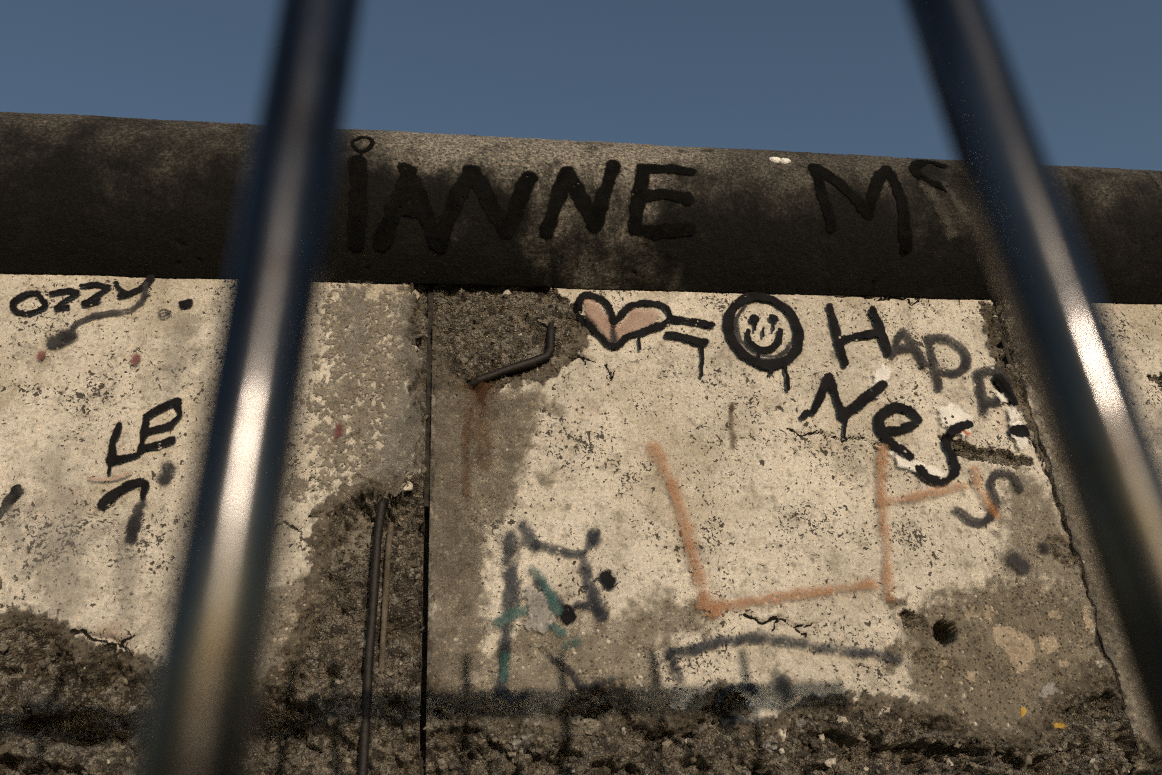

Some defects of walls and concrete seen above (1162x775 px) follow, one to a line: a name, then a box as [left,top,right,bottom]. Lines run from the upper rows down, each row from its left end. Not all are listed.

crack [994,381,1044,466]
peeling [0,484,24,516]
spalling [252,283,1162,775]
crack [743,613,813,637]
spalling [0,603,153,775]